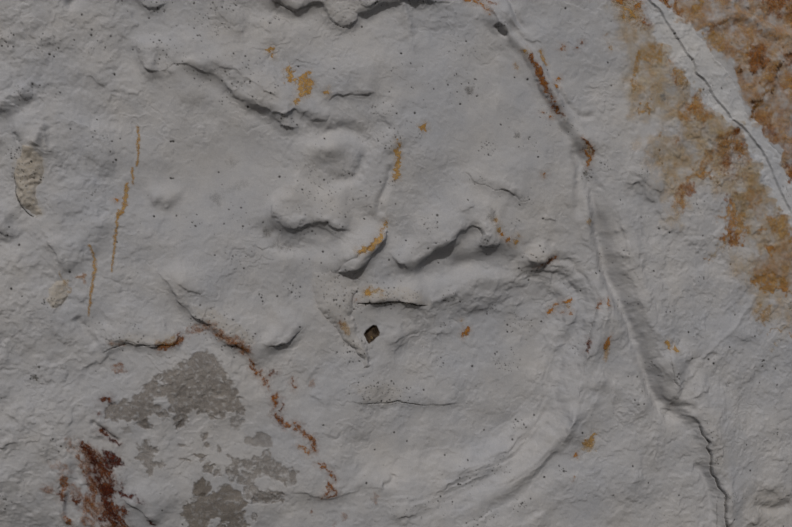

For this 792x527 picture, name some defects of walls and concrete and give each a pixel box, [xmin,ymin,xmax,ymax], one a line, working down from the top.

rust [523,49,564,118]
rust [157,333,184,351]
rust [220,330,316,453]
rust [59,428,144,527]
peeling [181,466,249,527]